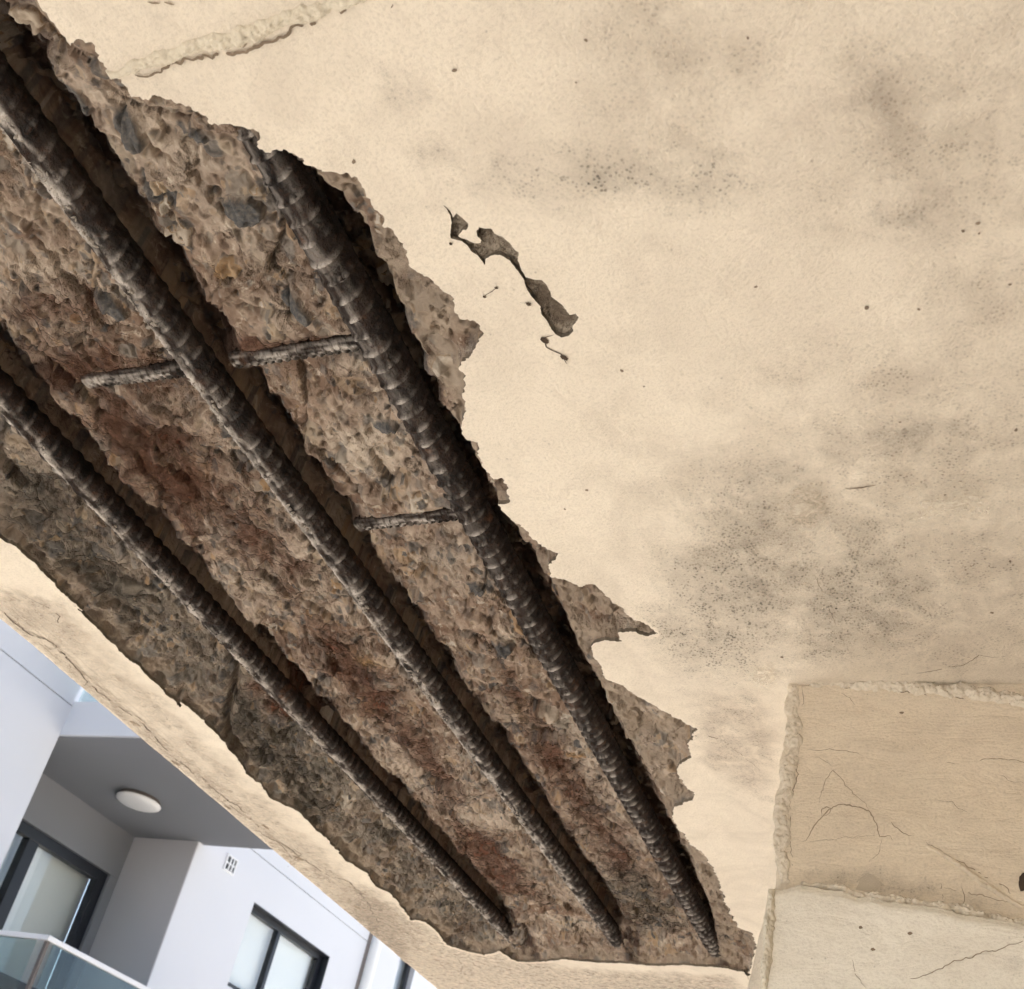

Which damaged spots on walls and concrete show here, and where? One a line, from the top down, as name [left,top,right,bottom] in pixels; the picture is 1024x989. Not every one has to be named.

corrosion [97,387,211,537]
corrosion [218,501,307,592]
spalling [0,0,756,974]
mould [665,524,774,671]
corrosion [249,682,293,721]
corrosion [282,654,310,694]
corrosion [320,637,543,902]
corrosion [527,719,632,873]
crack [790,748,1009,903]
crack [910,941,1022,979]